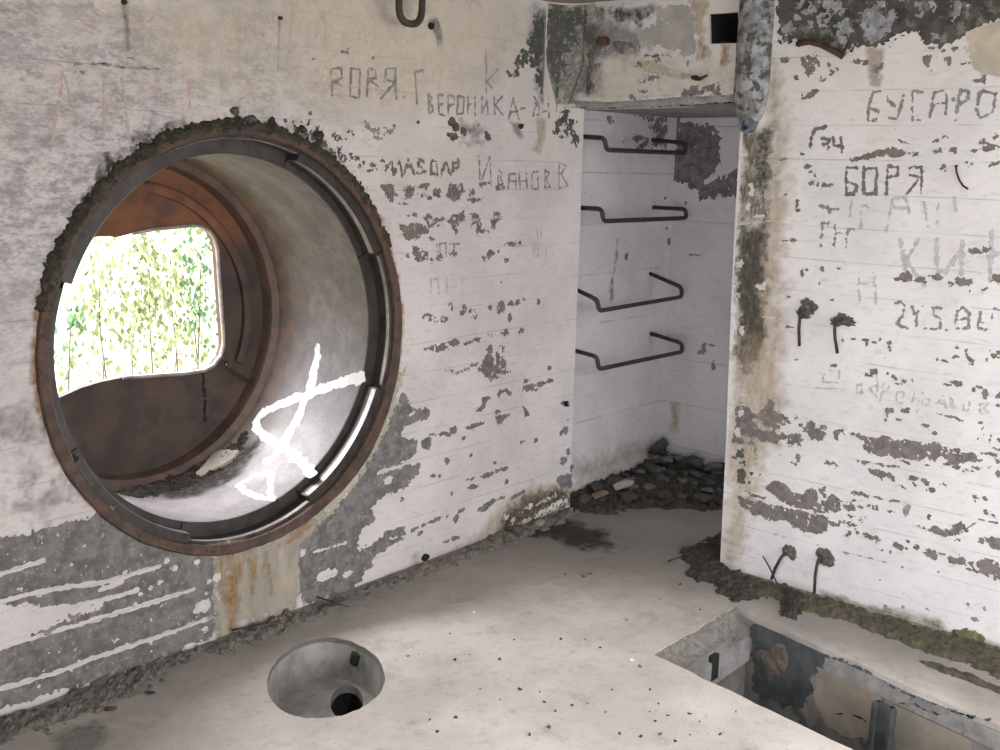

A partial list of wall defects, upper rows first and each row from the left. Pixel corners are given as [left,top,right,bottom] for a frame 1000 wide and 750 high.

peeling [506,4,587,98]
rust [796,39,849,59]
flaking render [922,21,1000,85]
peeling [623,115,765,218]
peeling [380,181,506,265]
water stain [734,128,780,500]
peeling [298,297,554,604]
water stain [496,488,612,550]
peeling [728,399,1000,581]
peeling [0,512,221,709]
rust [209,511,326,638]
water stain [749,624,825,709]